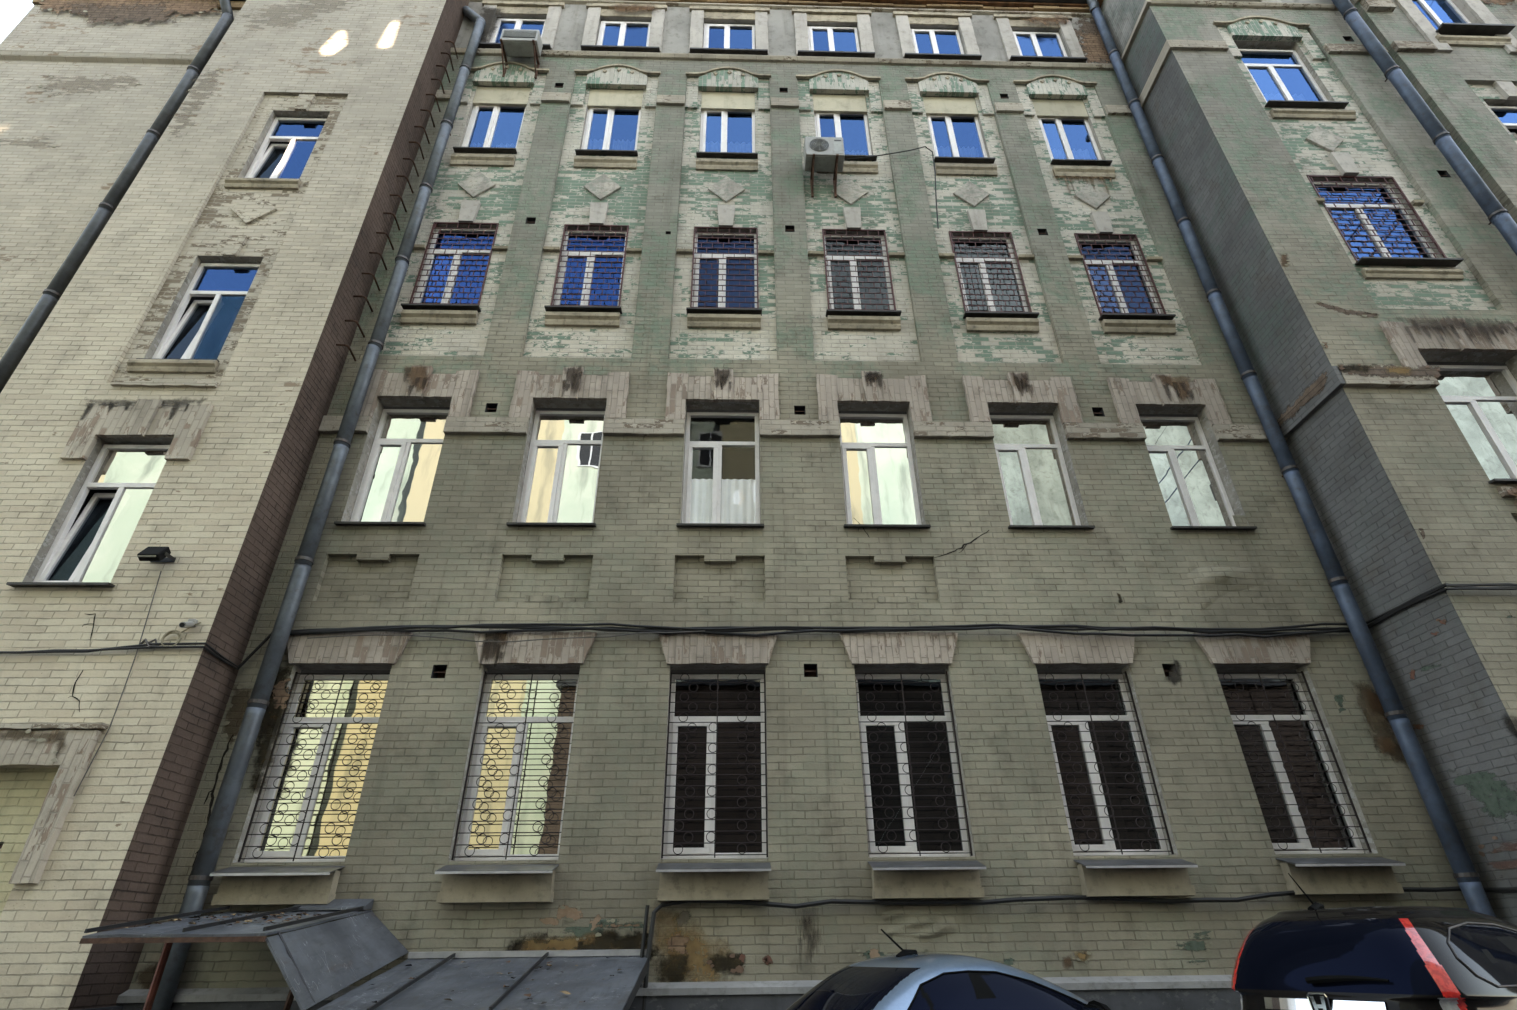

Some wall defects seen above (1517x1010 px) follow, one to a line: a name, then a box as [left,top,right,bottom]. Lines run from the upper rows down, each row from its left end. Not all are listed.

flaking render [36,0,222,28]
crack [934,530,989,558]
leakage [1356,685,1406,762]
leakage [656,912,729,982]